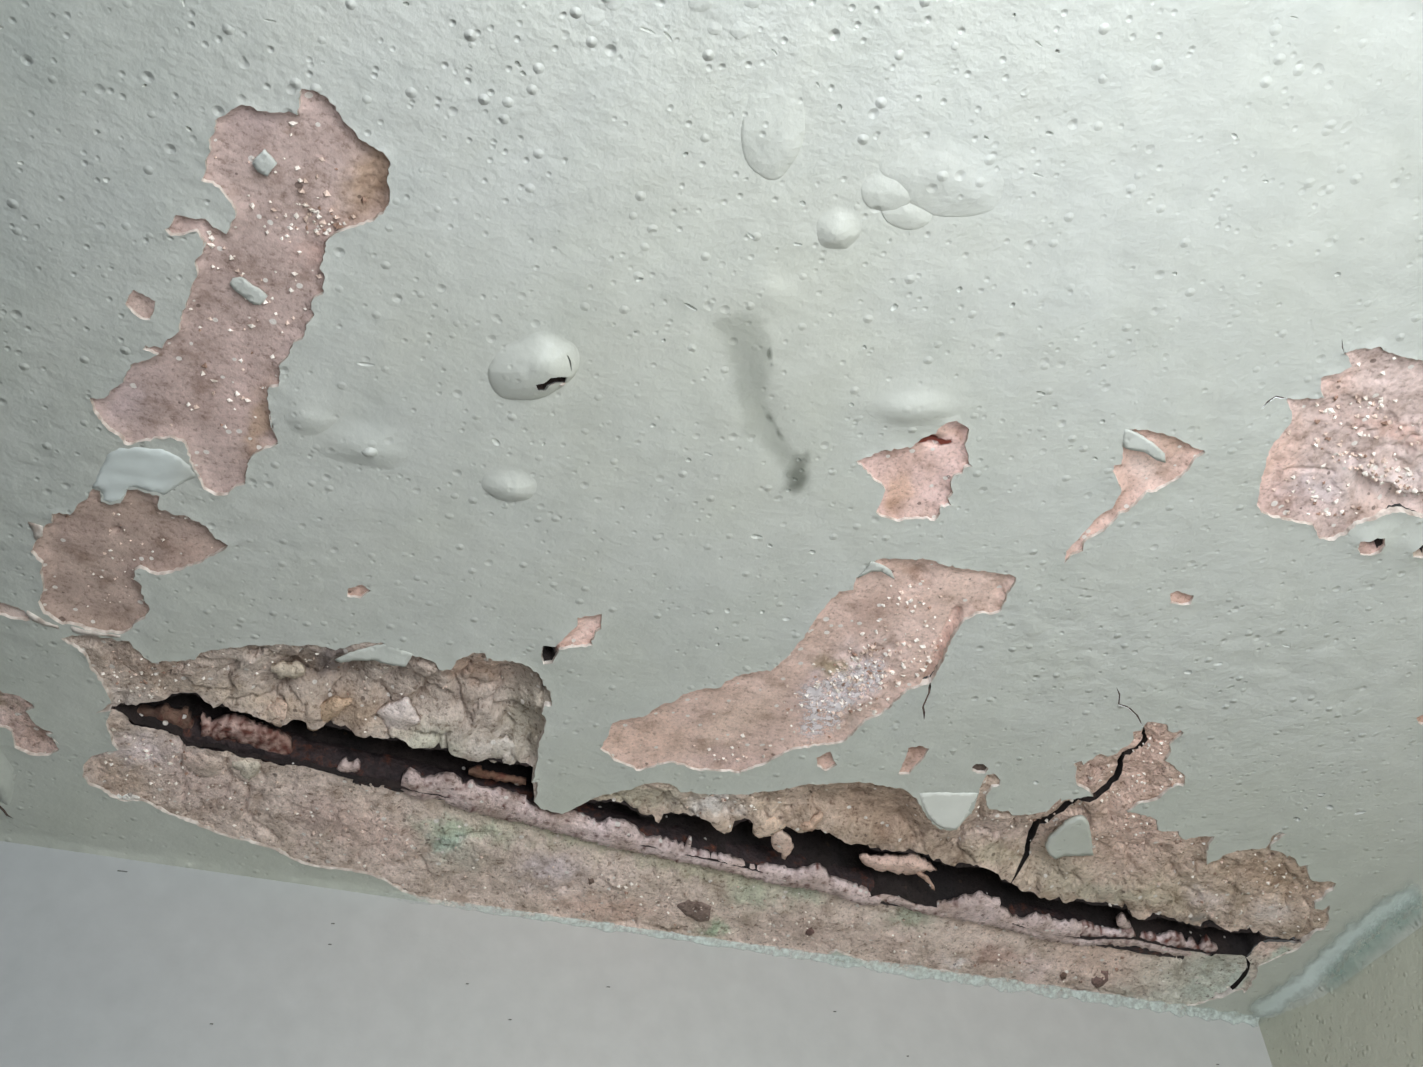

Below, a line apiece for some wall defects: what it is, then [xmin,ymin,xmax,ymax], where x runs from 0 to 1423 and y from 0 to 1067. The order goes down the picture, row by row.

spalling [1257,347,1423,556]
spalling [28,89,1336,1010]
peeling [0,602,59,629]
spalling [0,691,59,756]
crack [1117,689,1142,725]